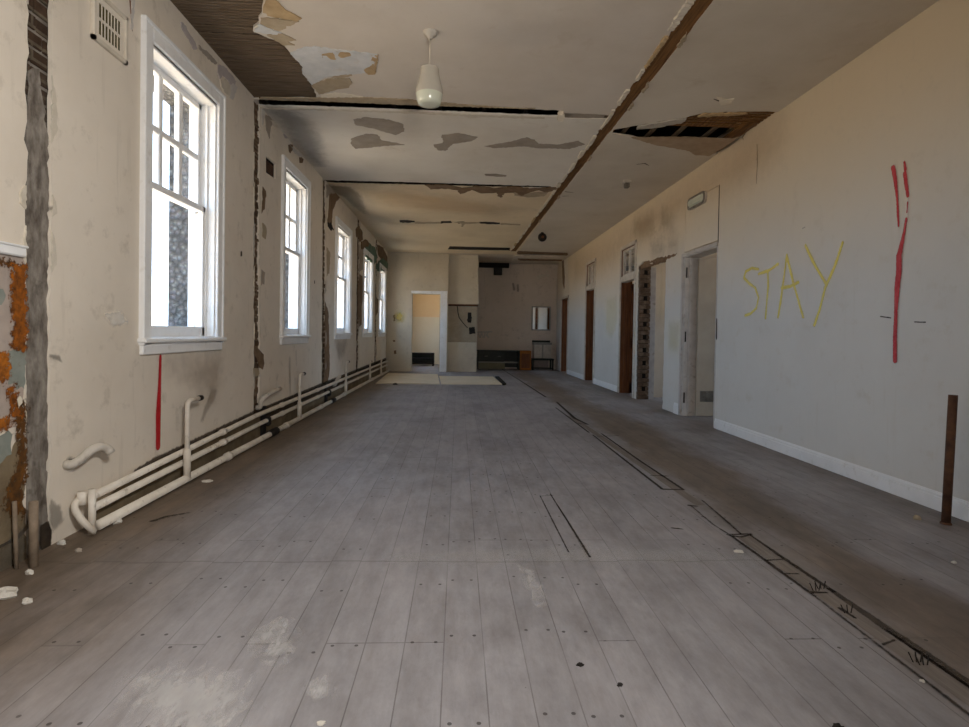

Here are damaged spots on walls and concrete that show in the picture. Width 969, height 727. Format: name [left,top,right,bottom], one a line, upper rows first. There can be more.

flaking render [0,0,58,572]
flaking render [96,0,545,521]
flaking render [400,0,775,294]